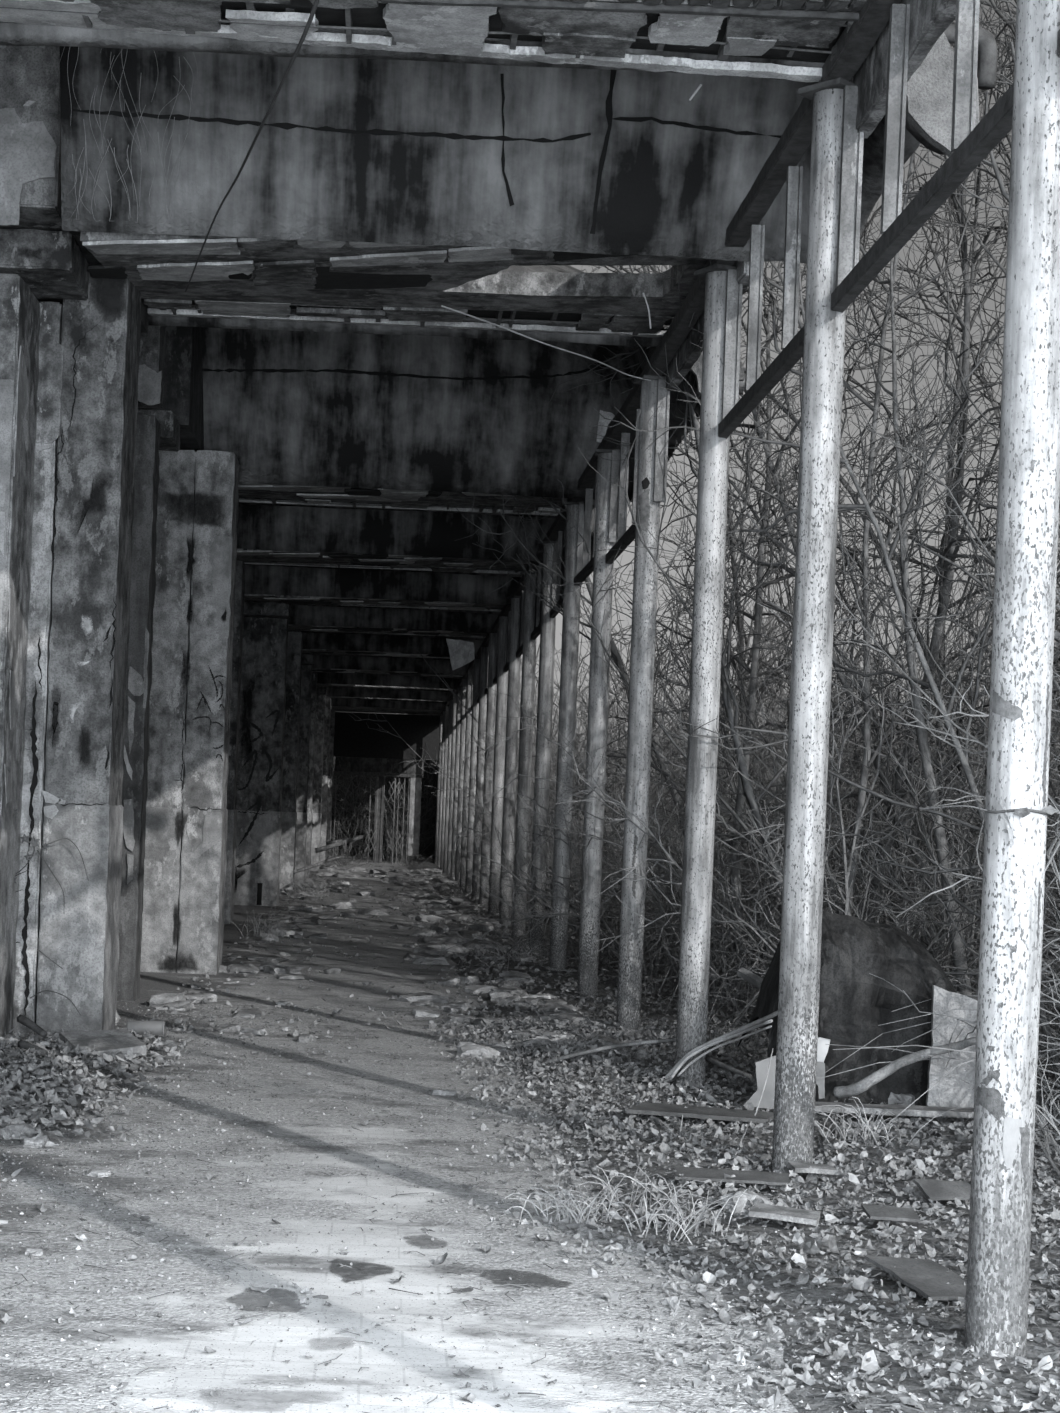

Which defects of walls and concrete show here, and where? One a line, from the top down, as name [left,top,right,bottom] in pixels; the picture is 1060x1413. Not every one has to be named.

crack [73,70,781,234]
crack [103,600,117,708]
crack [16,634,108,1016]